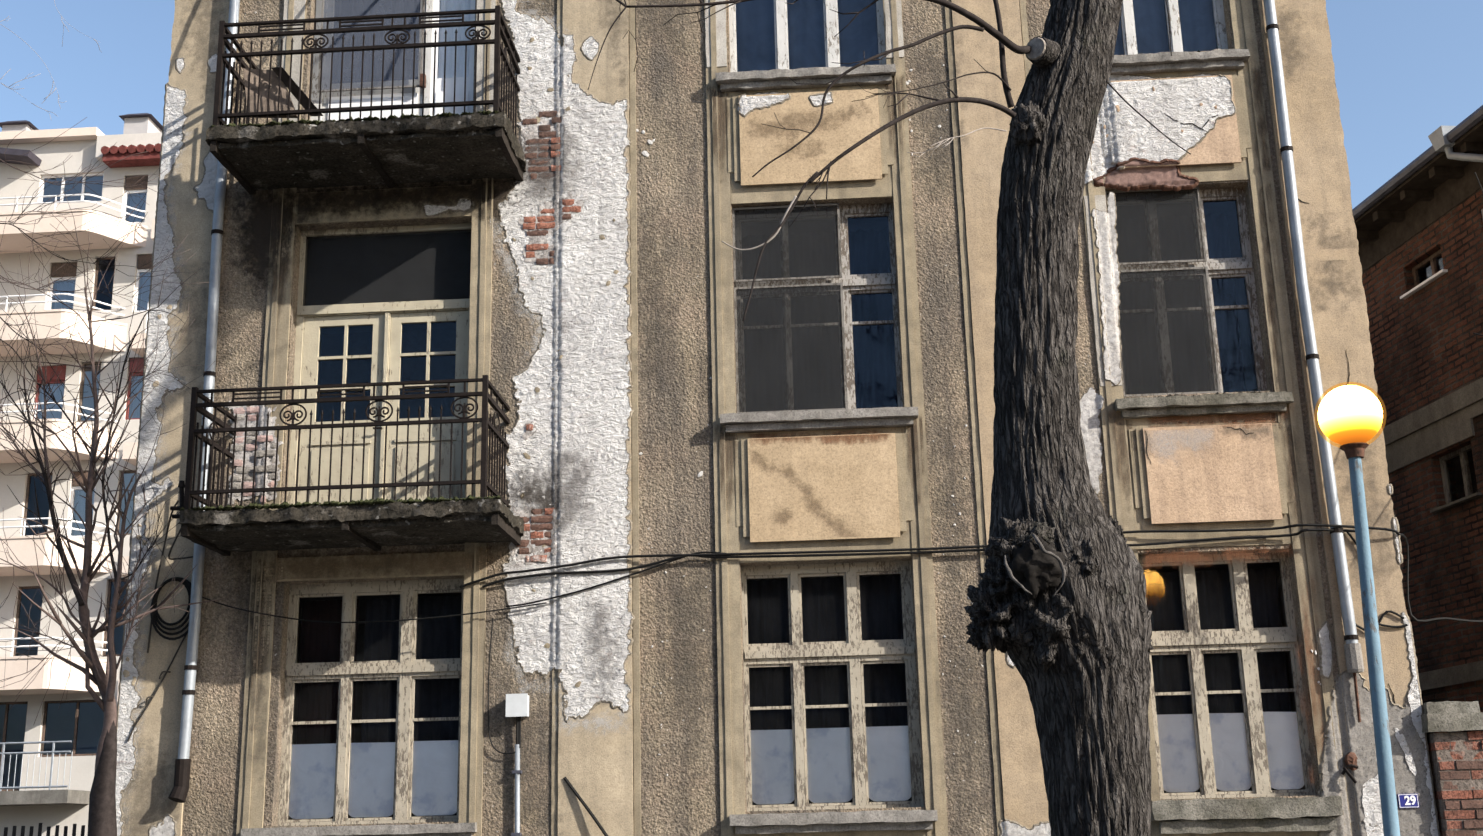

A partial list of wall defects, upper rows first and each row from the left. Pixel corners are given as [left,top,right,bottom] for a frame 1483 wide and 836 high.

peeling [736,91,834,117]
peeling [115,57,189,836]
damp [234,136,579,306]
damp [511,454,586,521]
peeling [497,0,655,723]
peeling [1080,72,1236,495]
flaking render [1311,611,1441,836]